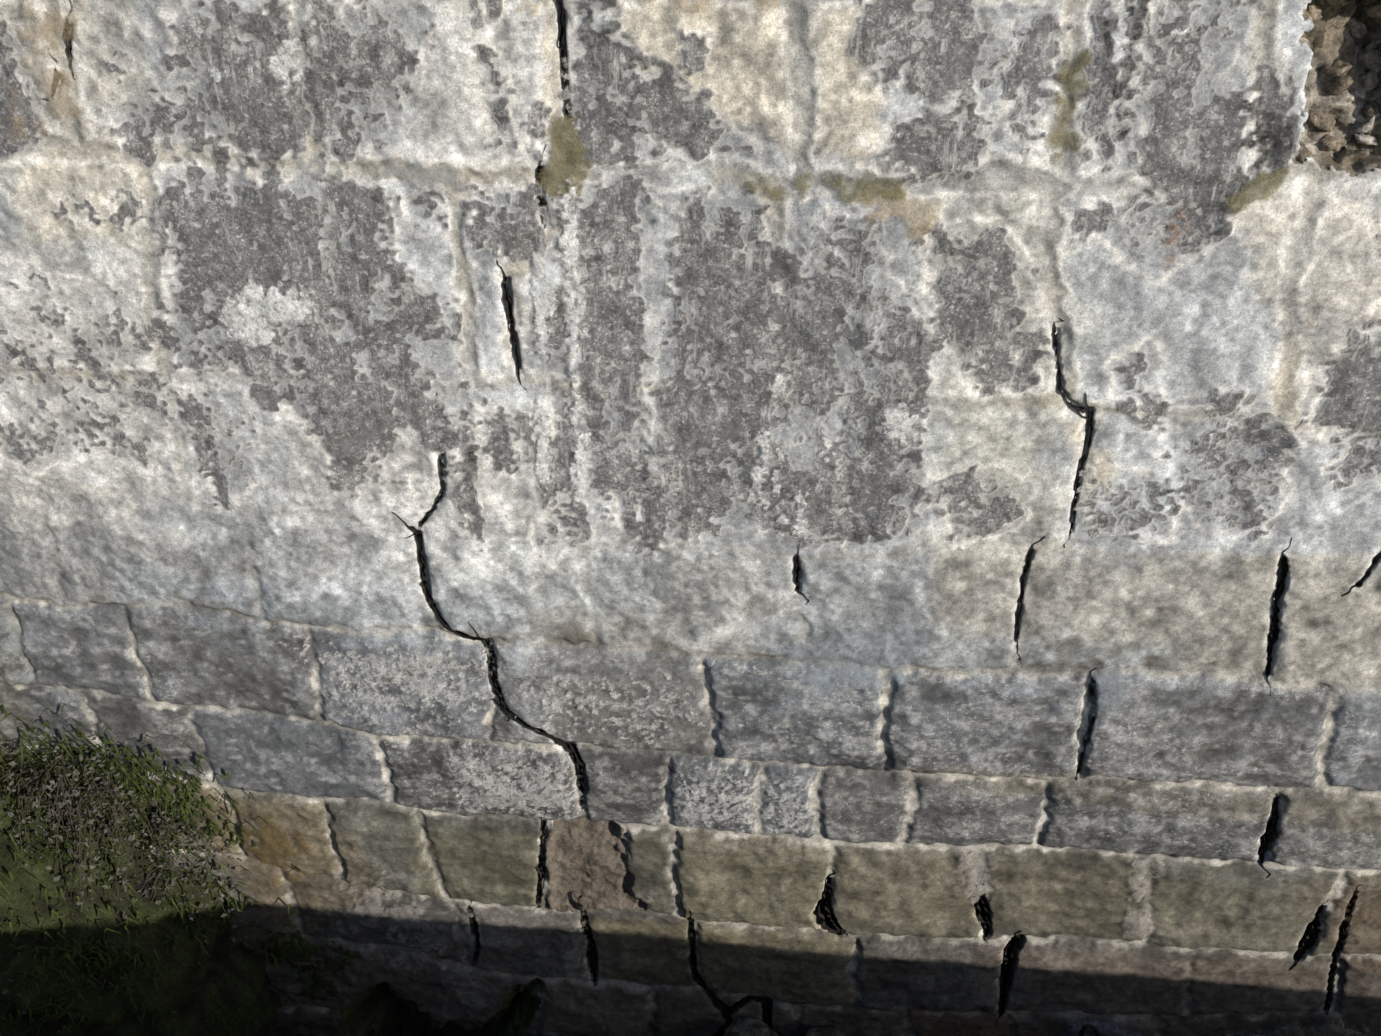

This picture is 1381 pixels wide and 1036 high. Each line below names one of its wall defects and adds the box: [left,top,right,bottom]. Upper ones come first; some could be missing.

peeling [848,0,1381,262]
crack [497,260,526,390]
crack [1016,318,1094,660]
crack [392,393,584,816]
crack [1342,553,1381,596]
crack [533,813,547,912]
crack [689,910,771,1036]
crack [1325,884,1363,1021]